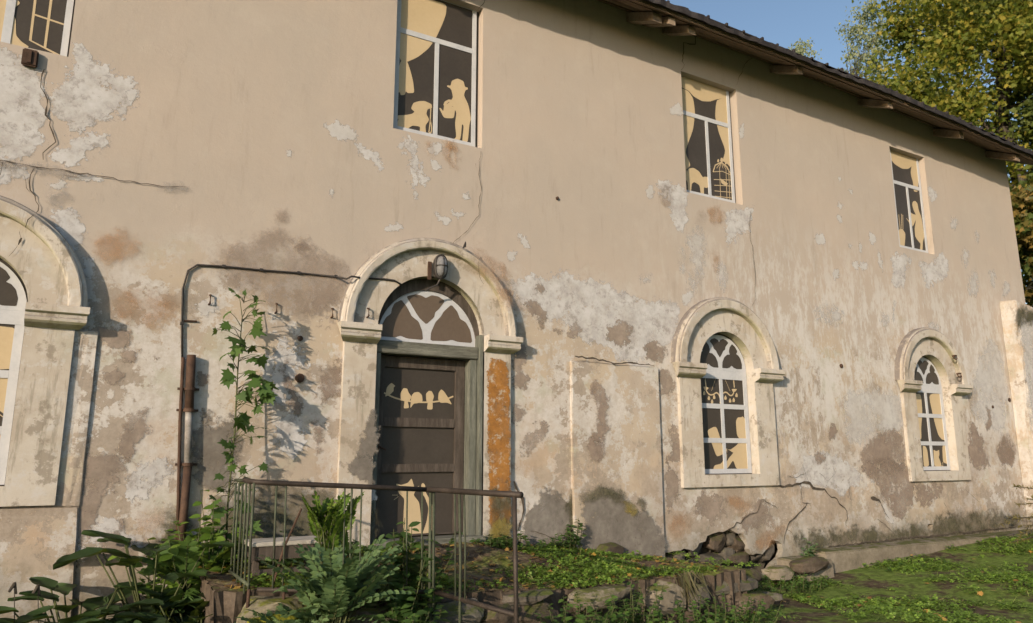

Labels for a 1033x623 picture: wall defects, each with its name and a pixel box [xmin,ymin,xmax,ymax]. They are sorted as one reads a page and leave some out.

peeling [0,42,140,190]
crack [0,69,185,256]
peeling [323,119,384,173]
peeling [646,179,689,233]
peeling [848,232,949,289]
peeling [260,335,343,459]
rust [486,358,512,536]
spalling [511,404,548,457]
peeling [507,268,694,395]
crack [575,356,654,366]
damp [564,486,624,543]
crack [729,462,1019,547]